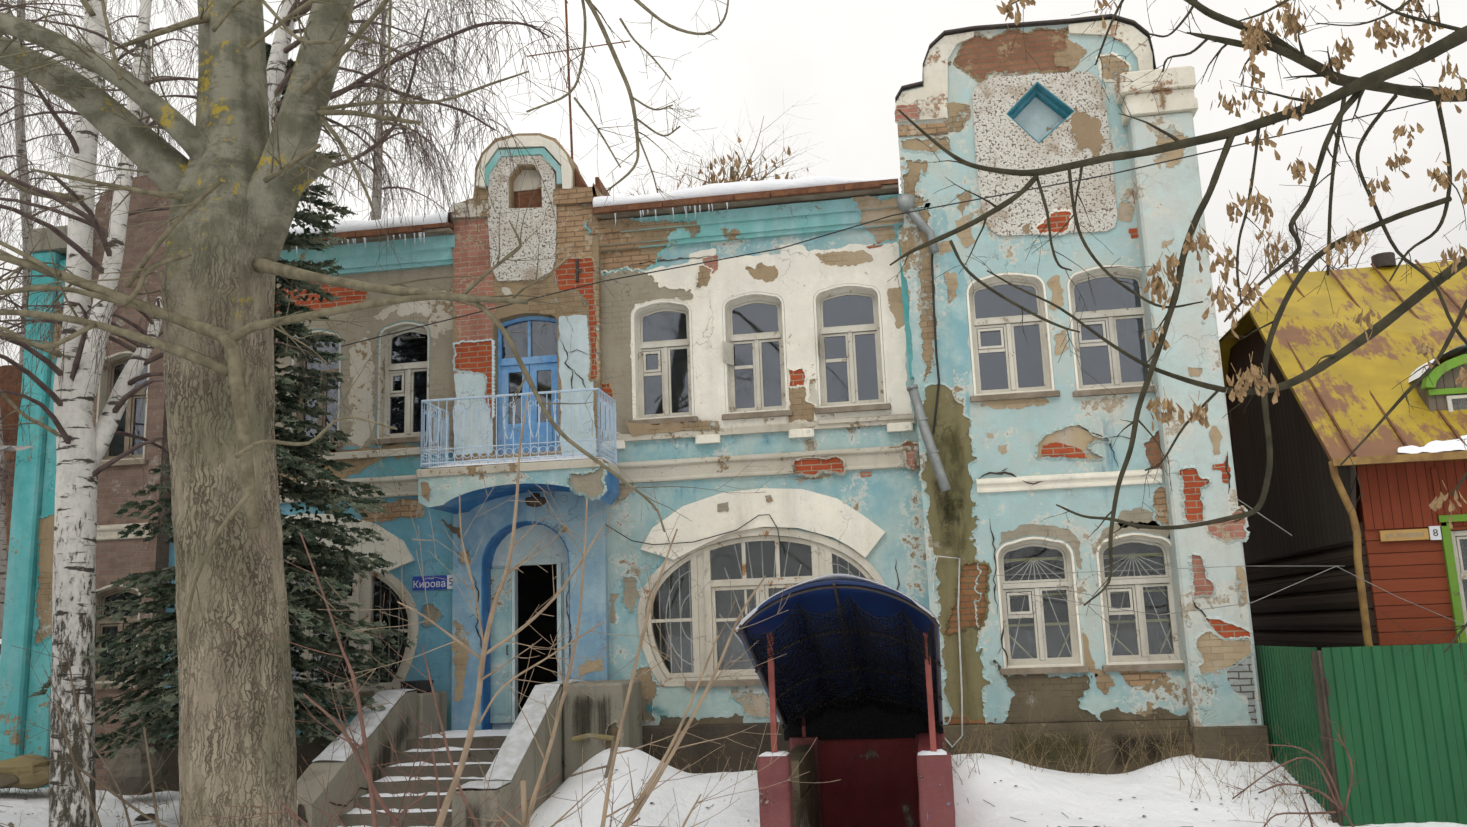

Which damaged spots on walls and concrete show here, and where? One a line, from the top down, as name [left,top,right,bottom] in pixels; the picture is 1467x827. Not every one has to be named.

flaking render [948,27,1132,84]
flaking render [275,218,512,482]
flaking render [567,463,637,507]
flaking render [553,205,720,436]
flaking render [745,262,778,283]
flaking render [786,366,872,486]
flaking render [815,102,1190,725]
flaking render [1098,419,1250,545]
flaking render [1188,367,1203,377]
spalling [602,719,624,750]
flaking render [634,664,770,726]
flaking render [1187,552,1258,723]